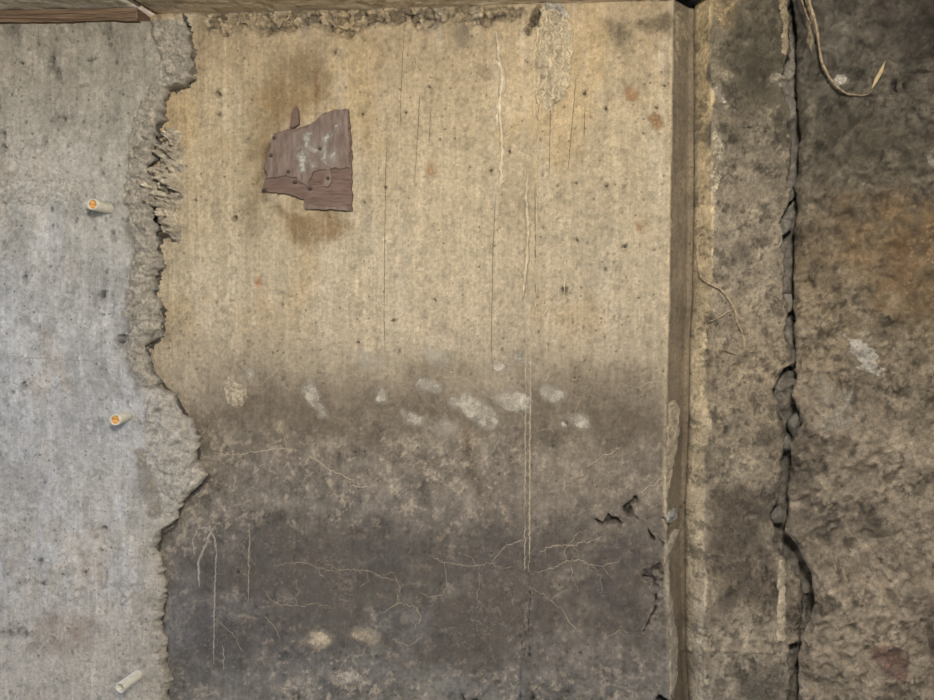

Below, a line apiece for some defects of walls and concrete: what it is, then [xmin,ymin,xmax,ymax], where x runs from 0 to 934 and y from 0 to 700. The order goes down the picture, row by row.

spalling [196,3,563,57]
leakage [495,32,506,194]
leakage [531,2,575,119]
spalling [112,19,192,395]
spalling [97,287,109,304]
leakage [186,168,560,670]
crack [724,7,816,700]
spalling [152,641,169,700]
crack [265,531,618,662]
crack [607,587,663,638]
spalling [592,400,685,700]